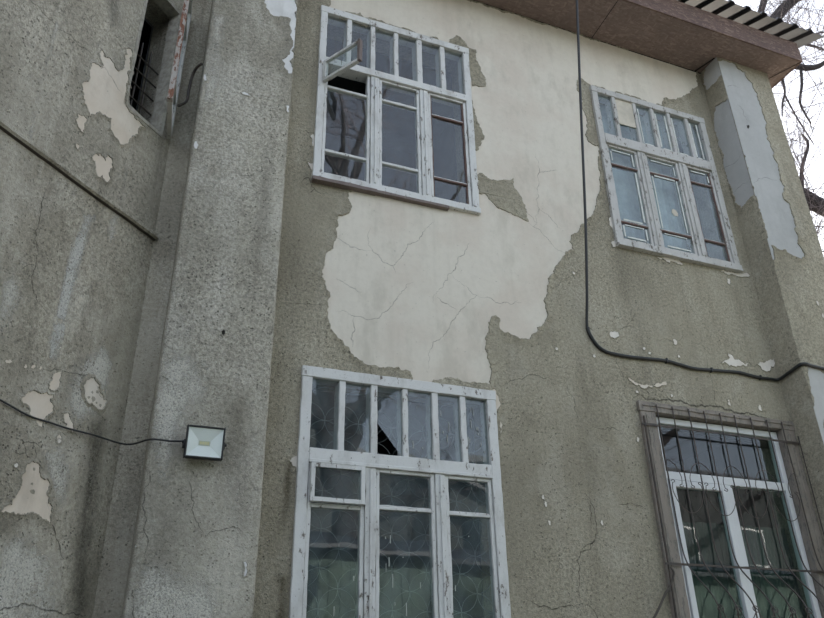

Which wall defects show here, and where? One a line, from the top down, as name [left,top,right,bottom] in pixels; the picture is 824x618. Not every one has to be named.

peeling [257,0,298,80]
peeling [75,44,146,149]
peeling [74,142,116,188]
peeling [312,0,810,439]
peeling [16,369,75,447]
peeling [79,373,110,414]
peeling [0,455,56,529]
crack [531,502,598,618]
crack [0,603,86,616]